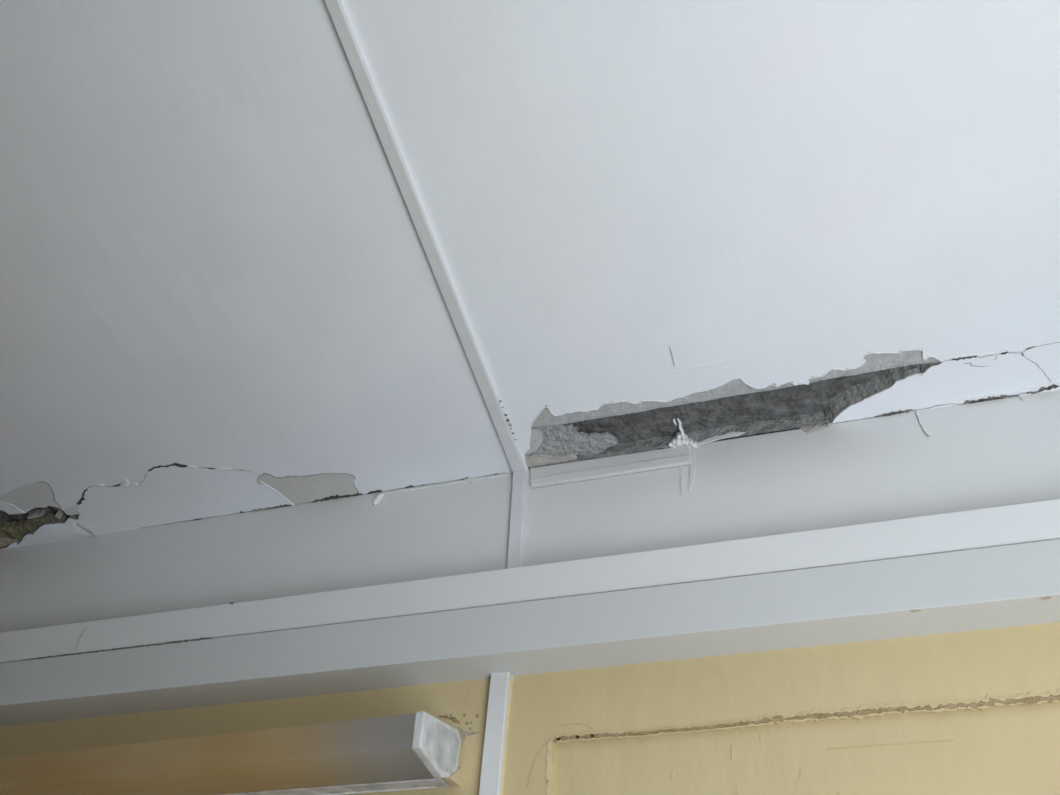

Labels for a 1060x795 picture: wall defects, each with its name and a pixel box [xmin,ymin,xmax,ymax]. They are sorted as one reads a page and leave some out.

flaking render [525,349,941,469]
crack [827,342,1060,425]
flaking render [0,481,79,549]
peeling [257,473,360,506]
crack [527,689,1060,787]